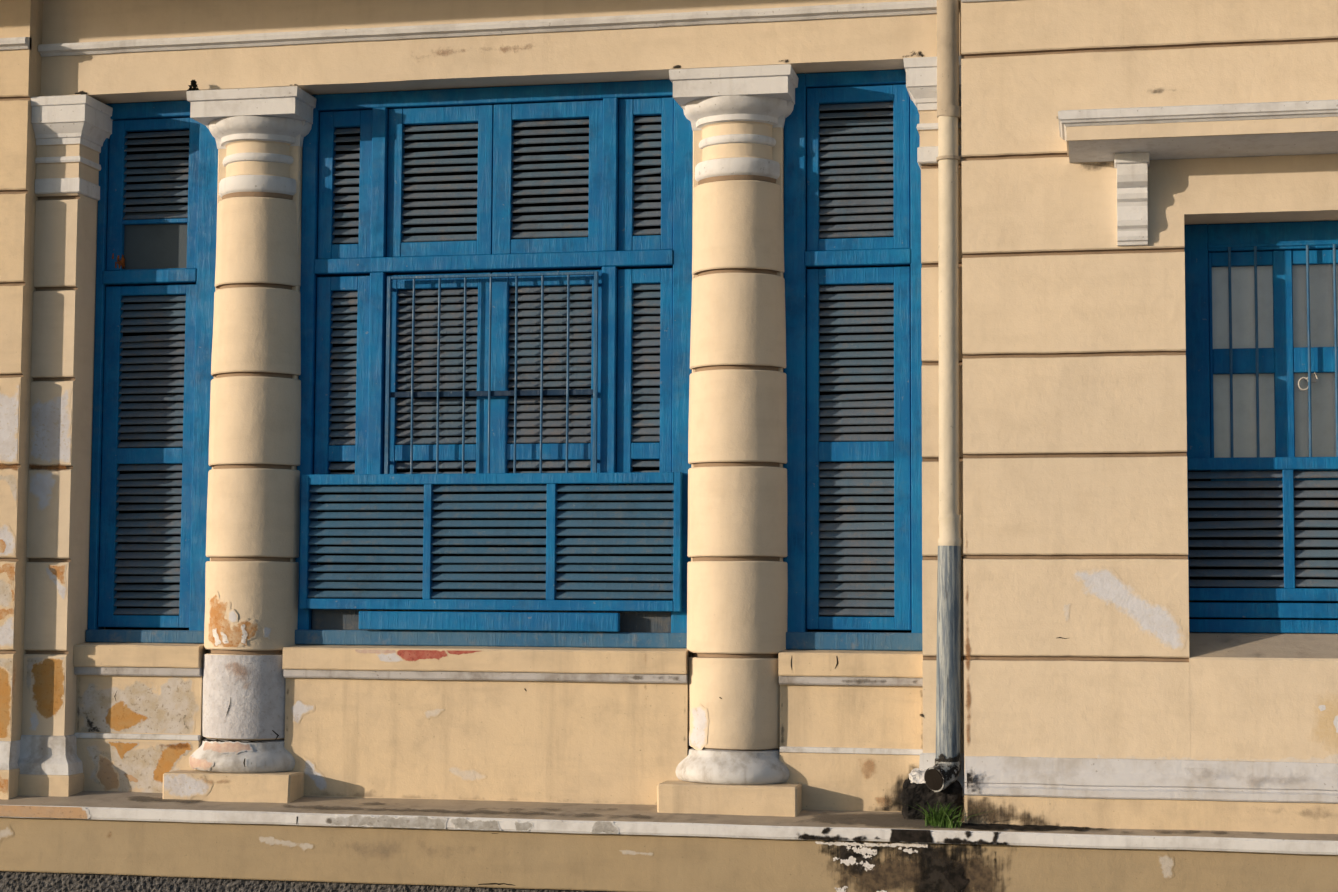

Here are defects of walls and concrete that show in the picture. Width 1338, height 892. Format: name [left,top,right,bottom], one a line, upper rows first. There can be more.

peeling [0,523,315,800]
flaking render [349,649,481,663]
peeling [0,774,92,819]